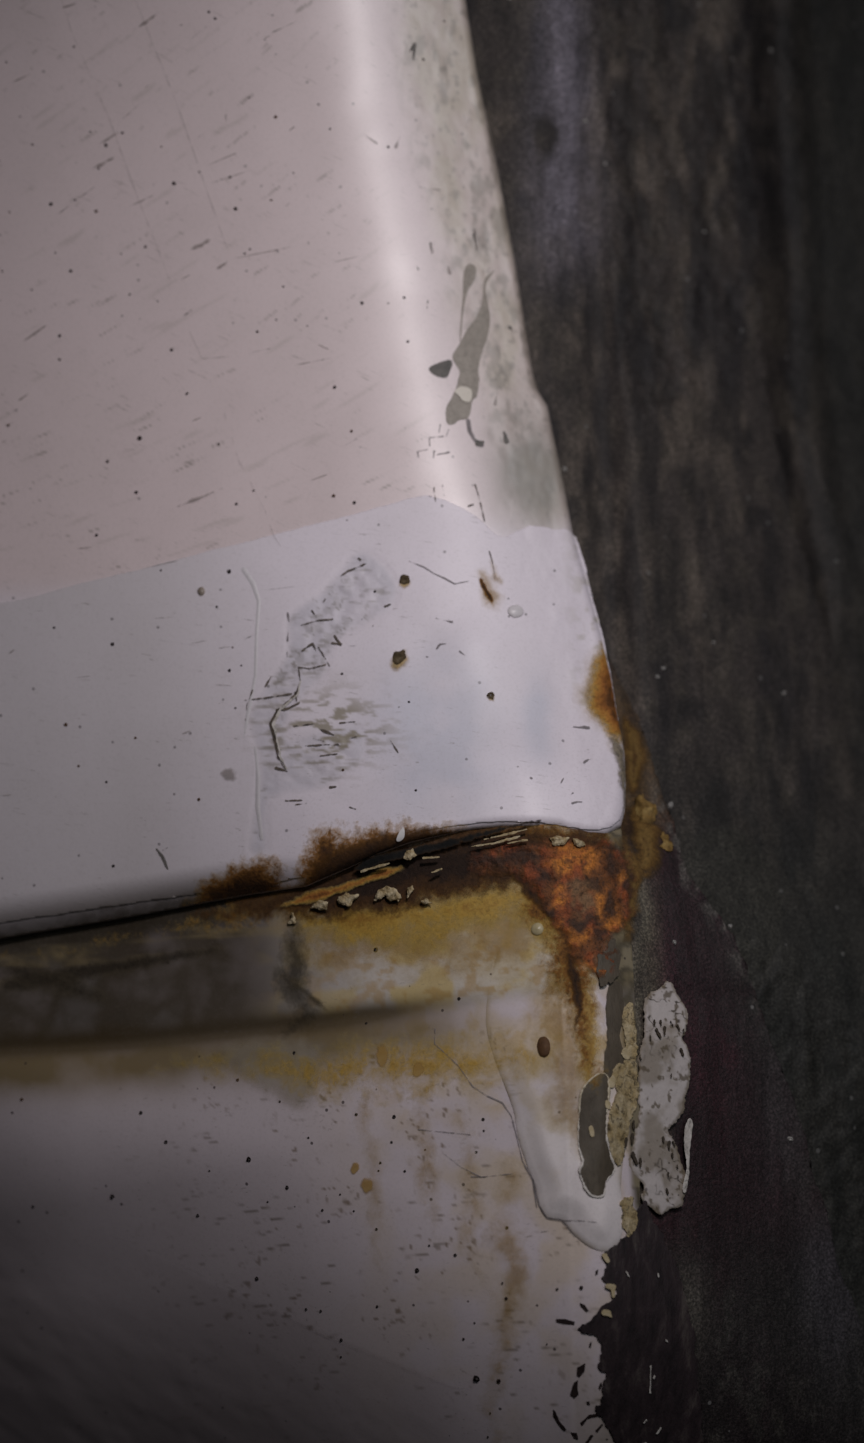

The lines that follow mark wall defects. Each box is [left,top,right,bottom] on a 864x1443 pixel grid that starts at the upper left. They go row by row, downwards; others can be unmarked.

peeling [429,233,494,447]
crack [245,558,366,809]
damp [5,950,213,995]
damp [230,1045,367,1100]
damp [282,940,321,1009]
rust [183,649,662,1085]
damp [384,1045,529,1092]
peeling [553,979,704,1443]